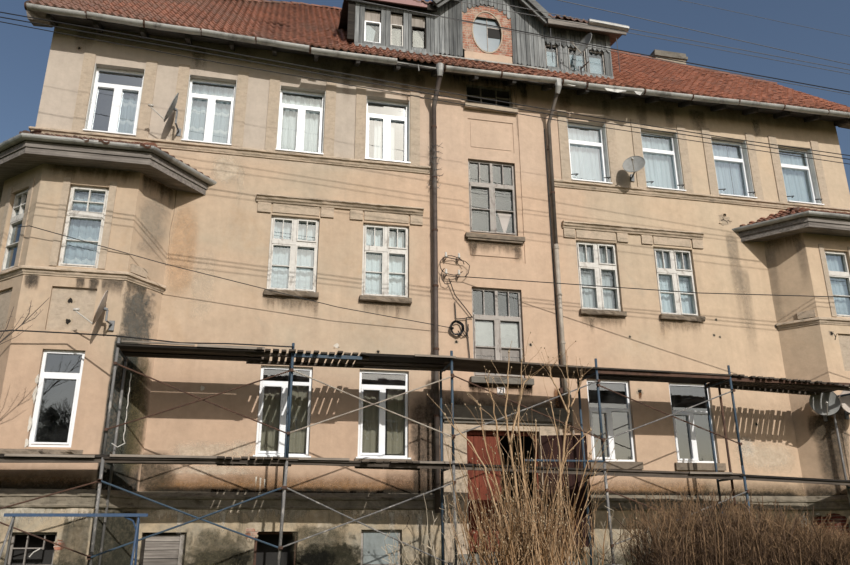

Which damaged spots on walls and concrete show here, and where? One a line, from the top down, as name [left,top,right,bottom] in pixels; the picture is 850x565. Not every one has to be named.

damp [0,278,431,494]
damp [809,408,848,480]
damp [590,484,847,496]
flaking render [799,511,850,547]